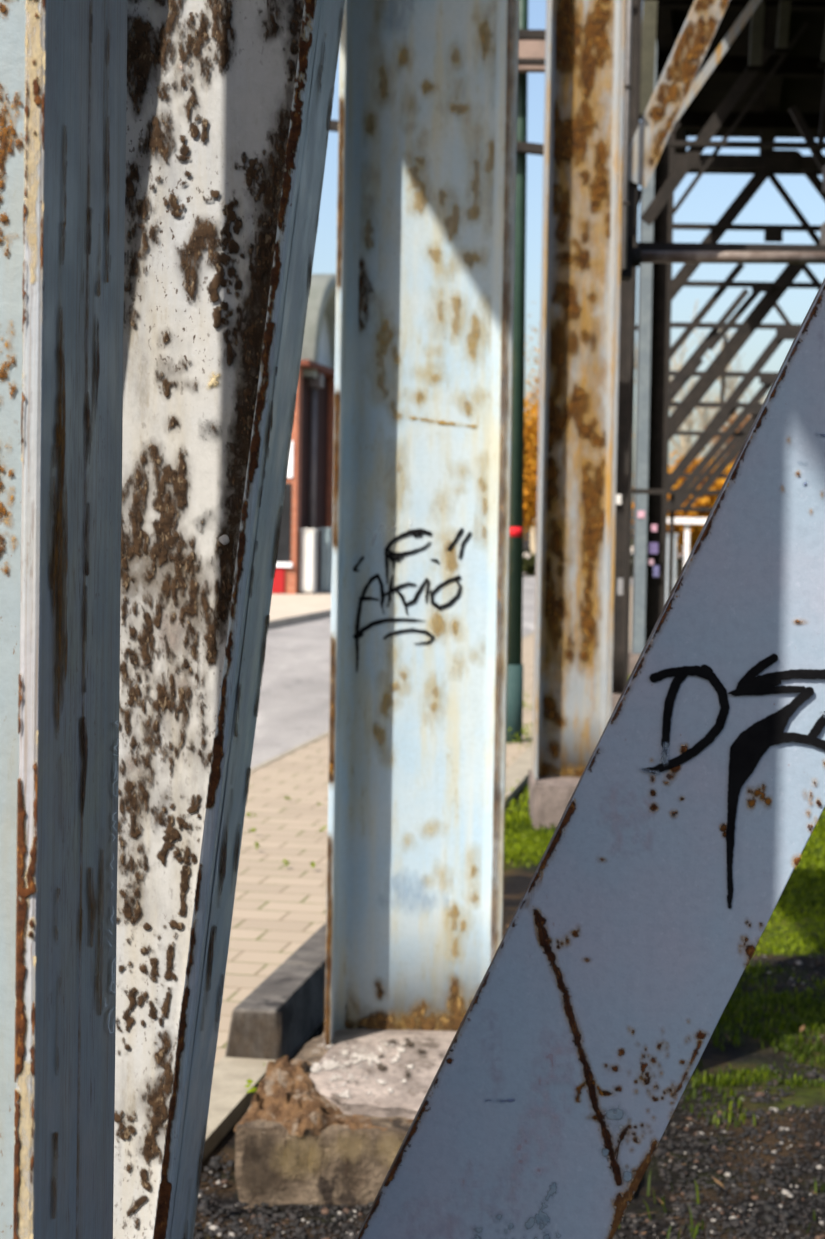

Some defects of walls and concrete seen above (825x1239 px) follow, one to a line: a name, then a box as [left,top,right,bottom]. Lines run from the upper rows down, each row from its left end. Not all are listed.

corrosion [0,0,46,256]
corrosion [267,0,344,323]
corrosion [649,0,728,164]
corrosion [0,261,26,574]
corrosion [345,0,513,1064]
corrosion [542,696,564,726]
corrosion [544,0,611,680]
corrosion [611,577,683,724]
corrosion [691,287,825,561]
corrosion [521,799,576,907]
corrosion [153,864,223,1239]
corrosion [358,1079,438,1239]